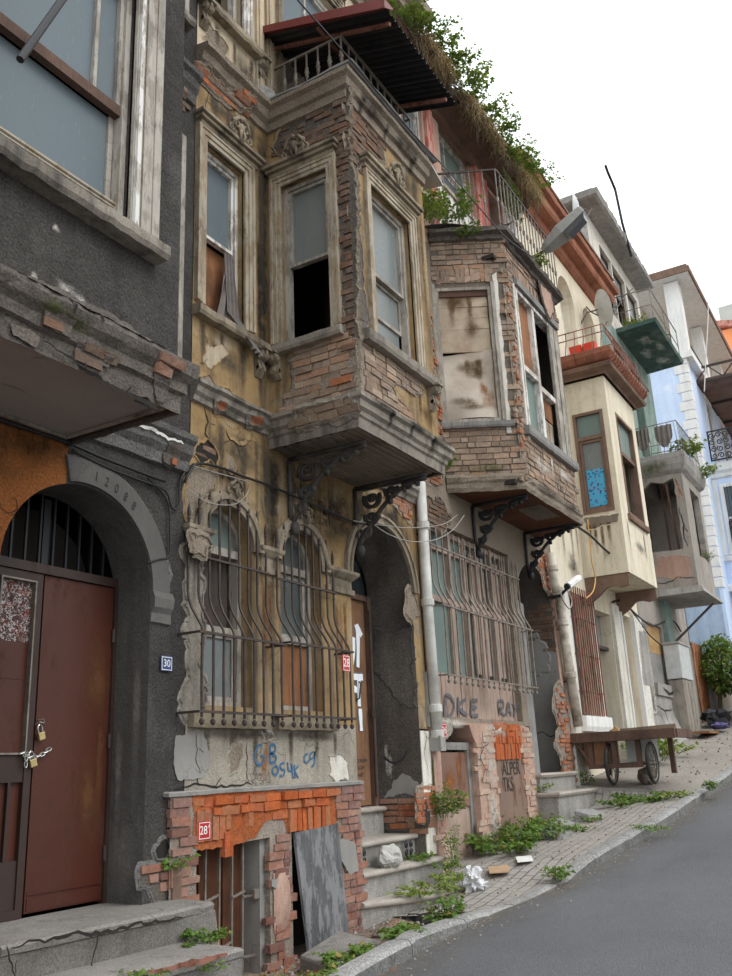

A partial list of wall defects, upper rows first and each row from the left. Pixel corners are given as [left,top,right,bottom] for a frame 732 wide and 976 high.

flaking render [194,60,257,118]
flaking render [10,310,120,371]
flaking render [134,351,186,413]
peeling [198,341,239,414]
peeling [140,425,183,444]
flaking render [167,437,238,725]
flaking render [528,633,578,782]
spalling [192,752,351,857]
crack [6,917,182,976]